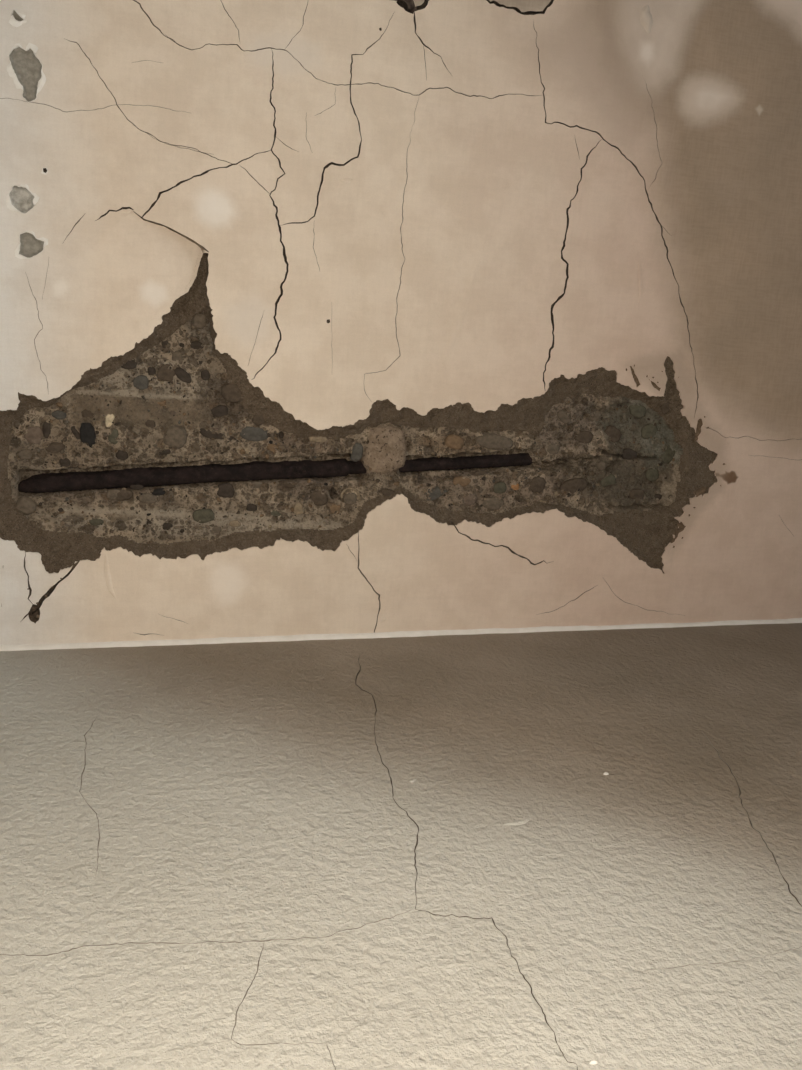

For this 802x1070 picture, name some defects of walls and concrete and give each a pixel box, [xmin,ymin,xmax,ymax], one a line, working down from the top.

peeling [7,43,46,103]
peeling [6,184,40,214]
crack [0,0,802,460]
spalling [0,211,725,573]
crack [22,555,80,623]
crack [347,531,380,632]
crack [450,520,554,565]
crack [0,656,578,1070]
crack [707,738,802,907]